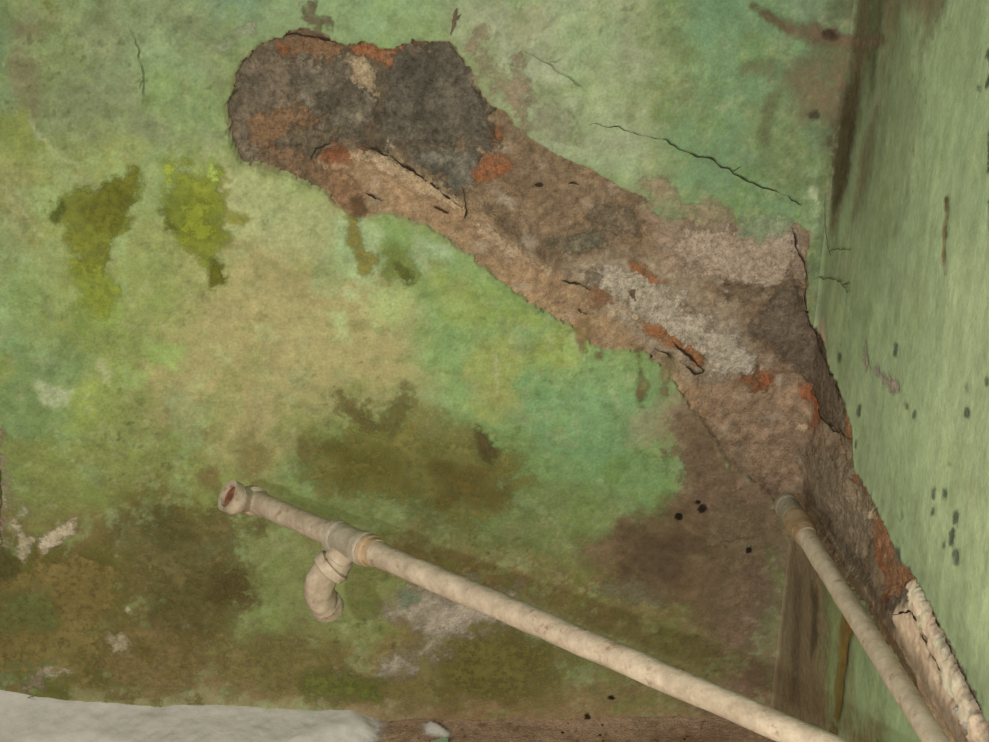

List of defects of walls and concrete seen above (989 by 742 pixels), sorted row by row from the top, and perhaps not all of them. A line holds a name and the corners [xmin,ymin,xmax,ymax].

crack [524,51,584,91]
water stain [751,0,941,225]
water stain [209,260,224,287]
crack [590,123,851,293]
spalling [227,2,989,742]
peeling [0,429,77,564]
water stain [299,382,538,533]
peeling [22,665,74,691]
peeling [86,602,227,707]
water stain [110,507,266,641]
water stain [303,585,551,705]
water stain [783,548,828,729]